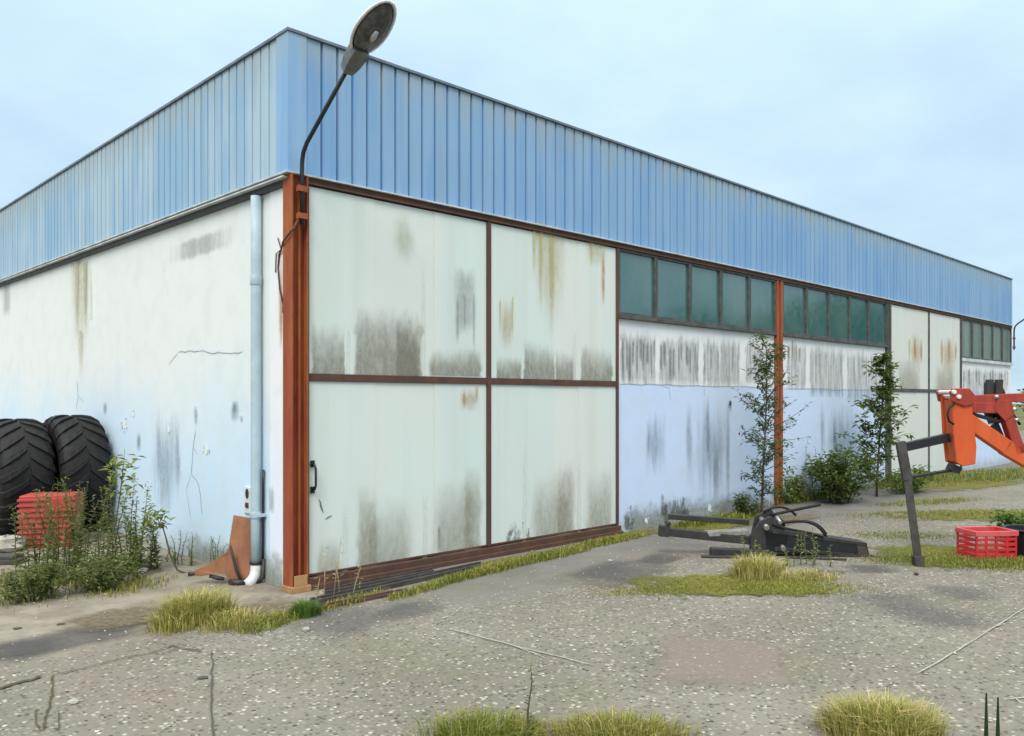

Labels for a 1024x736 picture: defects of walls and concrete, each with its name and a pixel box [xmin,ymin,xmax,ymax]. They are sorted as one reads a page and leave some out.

corrosion [533,222,553,296]
crack [169,350,241,364]
water stain [313,309,480,377]
water stain [622,342,696,377]
crack [186,435,202,518]
water stain [625,497,766,531]